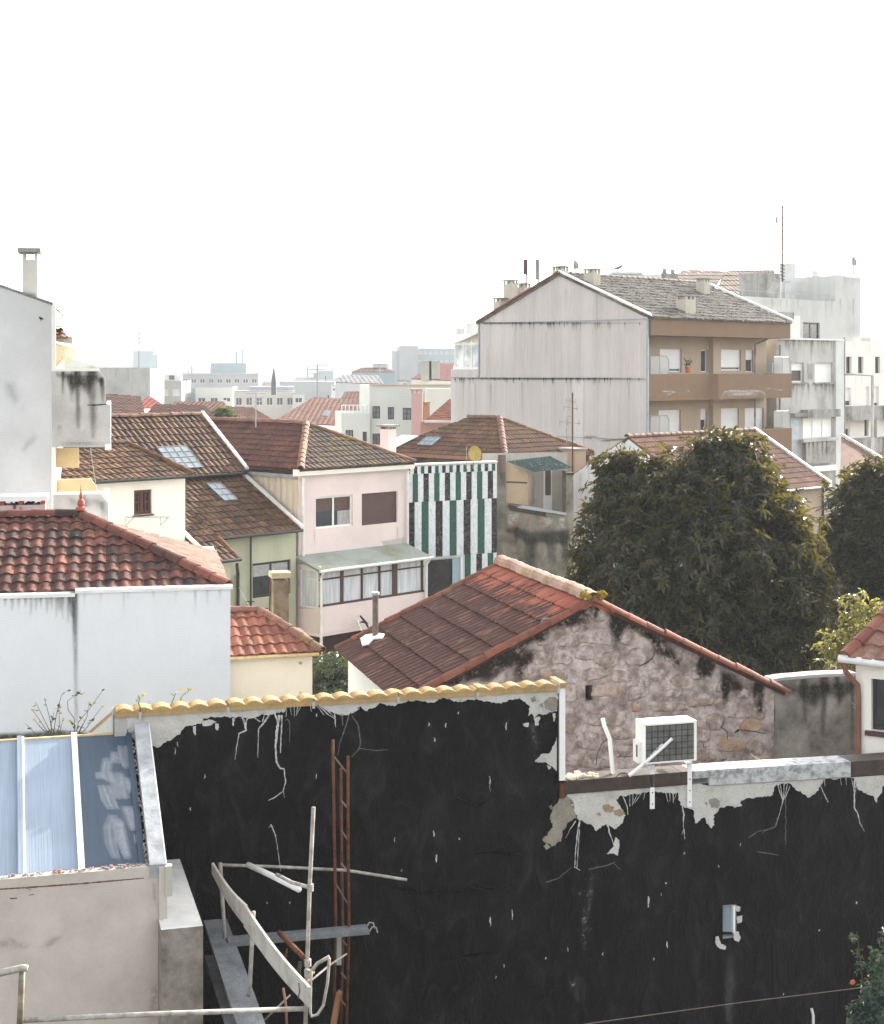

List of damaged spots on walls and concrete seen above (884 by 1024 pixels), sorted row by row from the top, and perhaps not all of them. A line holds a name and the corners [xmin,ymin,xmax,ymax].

water stain [62,371,103,391]
peeling [127,708,286,753]
peeling [316,691,558,727]
water stain [697,658,764,711]
water stain [789,677,854,709]
peeling [535,738,557,771]
peeling [542,775,884,855]
crack [748,798,787,855]
crack [546,862,620,883]
peeling [715,904,742,950]